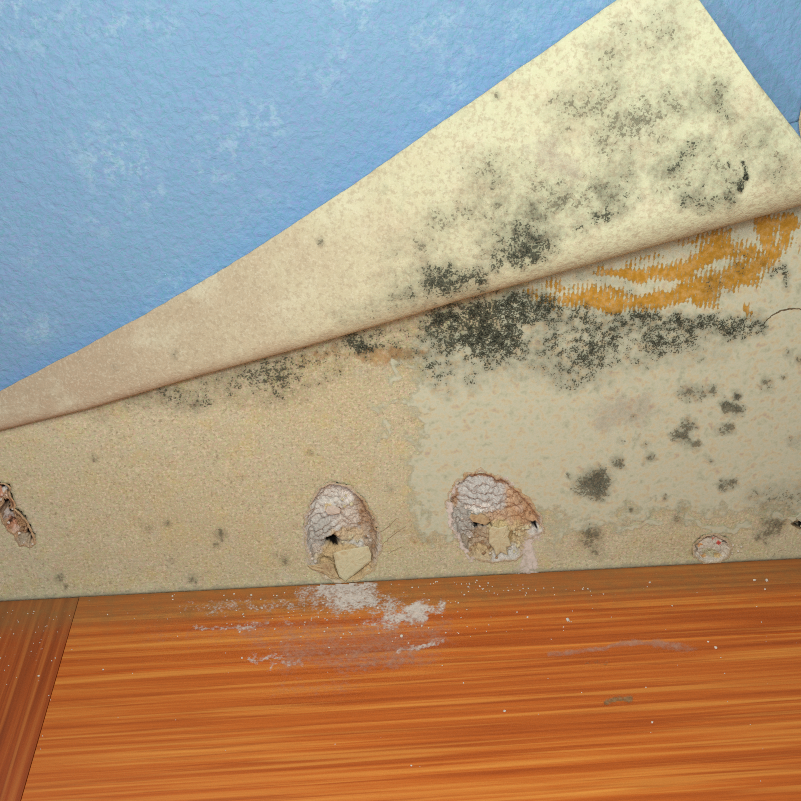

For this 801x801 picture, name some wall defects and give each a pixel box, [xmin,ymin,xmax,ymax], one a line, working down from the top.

water stain [548,81,682,162]
water stain [656,141,749,215]
peeling [0,0,801,564]
water stain [226,167,800,403]
water stain [159,379,217,408]
water stain [670,421,701,447]
water stain [677,384,746,436]
water stain [566,459,625,501]
spalling [302,481,383,583]
water stain [516,532,541,574]
water stain [582,523,604,555]
water stain [755,518,785,544]